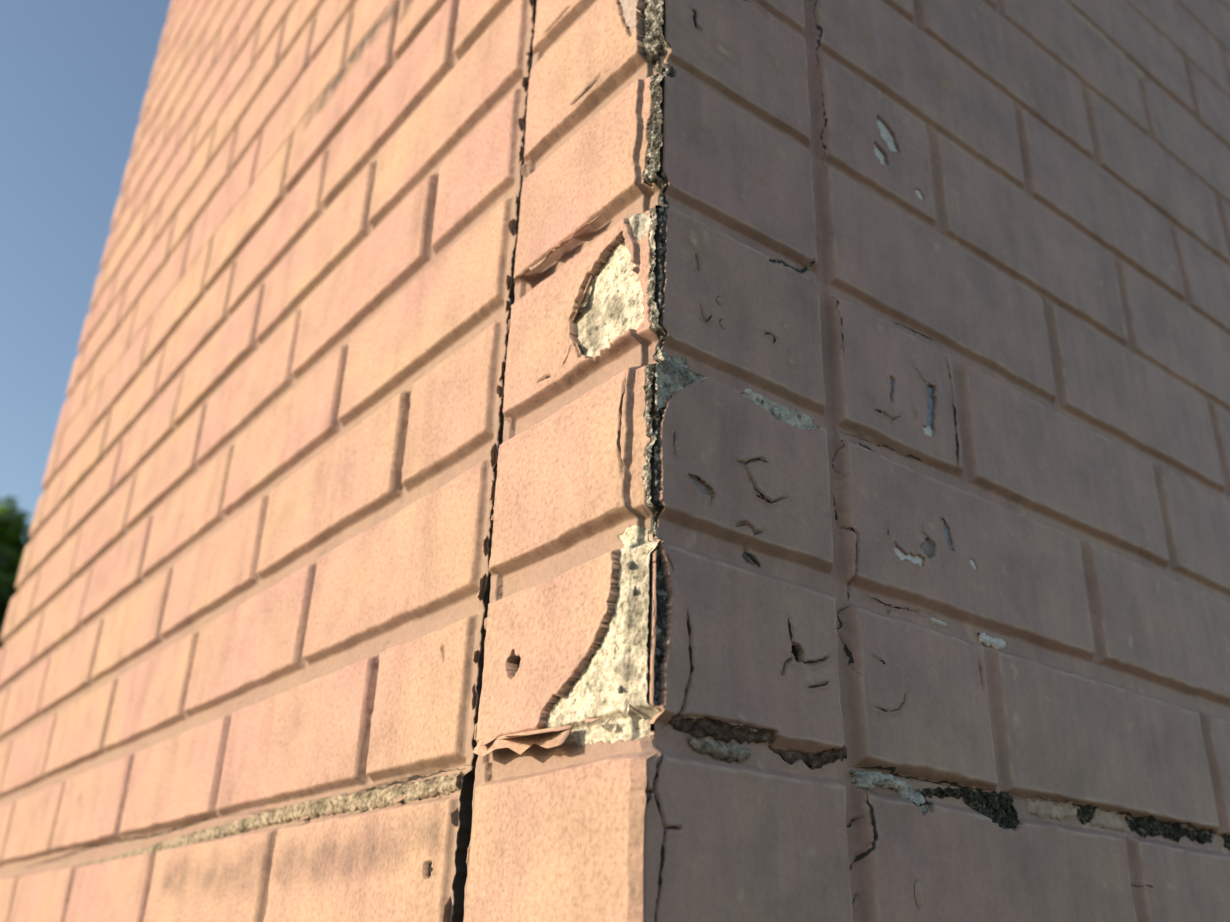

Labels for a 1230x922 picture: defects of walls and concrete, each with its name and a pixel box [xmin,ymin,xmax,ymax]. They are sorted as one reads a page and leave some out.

peeling [874,120,898,165]
spalling [472,0,708,757]
crack [616,375,626,480]
spalling [740,388,817,430]
crack [737,458,783,504]
spalling [687,737,751,764]
crack [645,611,1230,922]
spalling [850,770,932,812]
peeling [1027,798,1079,821]
peeling [1090,808,1130,833]
peeling [443,895,451,922]